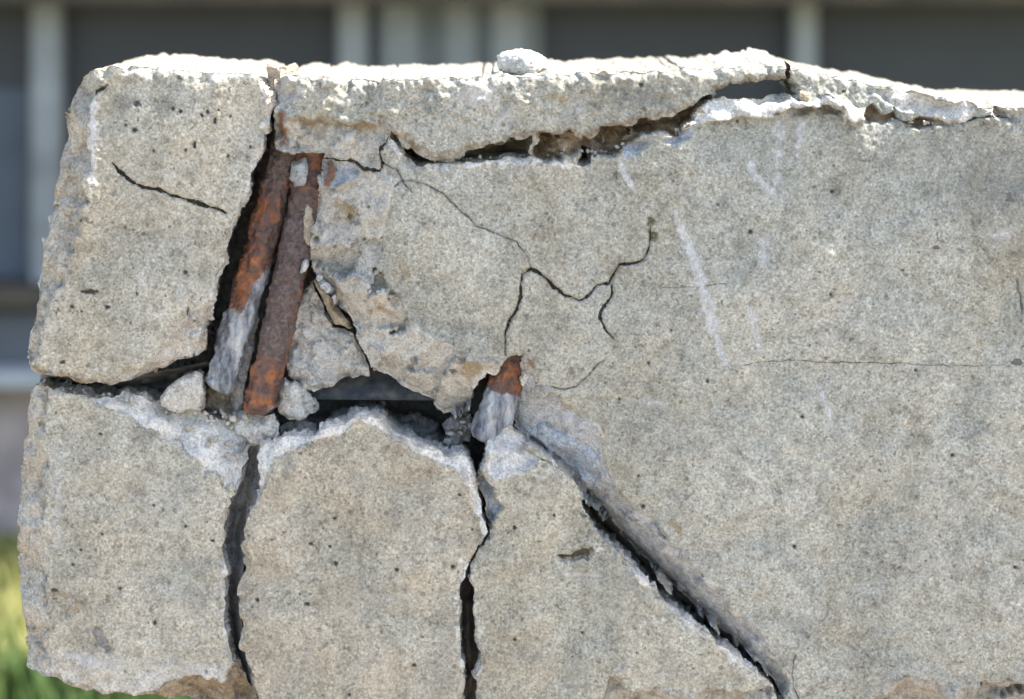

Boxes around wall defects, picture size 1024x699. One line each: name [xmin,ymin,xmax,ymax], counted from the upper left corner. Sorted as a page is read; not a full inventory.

crack [461,109,705,159]
crack [963,115,1008,123]
crack [113,164,226,213]
spalling [276,116,497,409]
crack [324,136,651,390]
crack [39,353,211,400]
spalling [118,304,209,378]
crack [473,460,482,471]
crack [224,440,263,699]
crack [460,558,480,699]
crack [584,500,799,699]